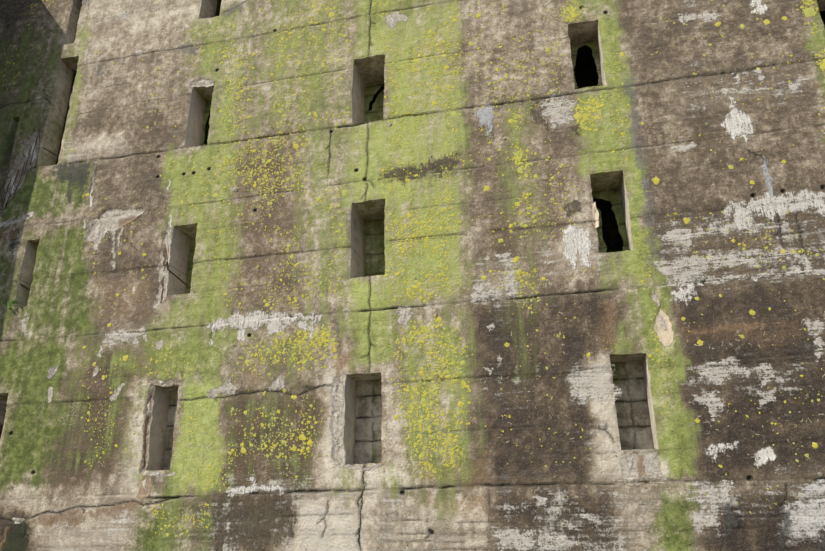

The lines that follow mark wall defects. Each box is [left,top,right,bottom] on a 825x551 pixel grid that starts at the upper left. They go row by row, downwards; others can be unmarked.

damp [383,153,459,186]
spalling [85,208,145,269]
peeling [652,291,674,346]
crack [182,384,330,401]
crack [0,496,180,522]
crack [357,465,366,549]
damp [3,515,29,551]